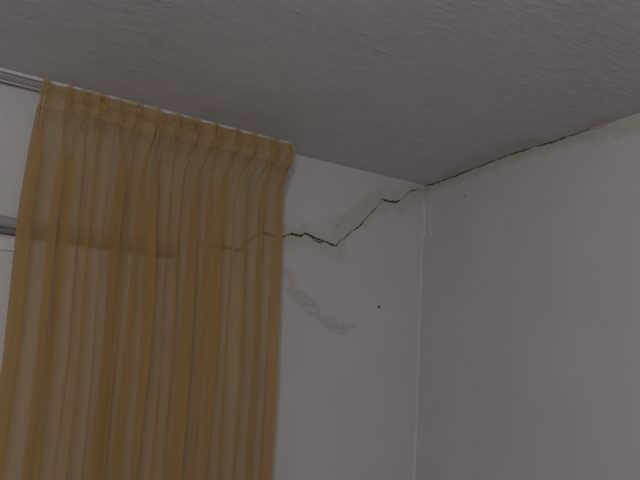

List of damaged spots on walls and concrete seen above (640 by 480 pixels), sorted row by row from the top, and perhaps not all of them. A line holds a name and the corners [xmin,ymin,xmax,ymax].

crack [282,129,591,246]